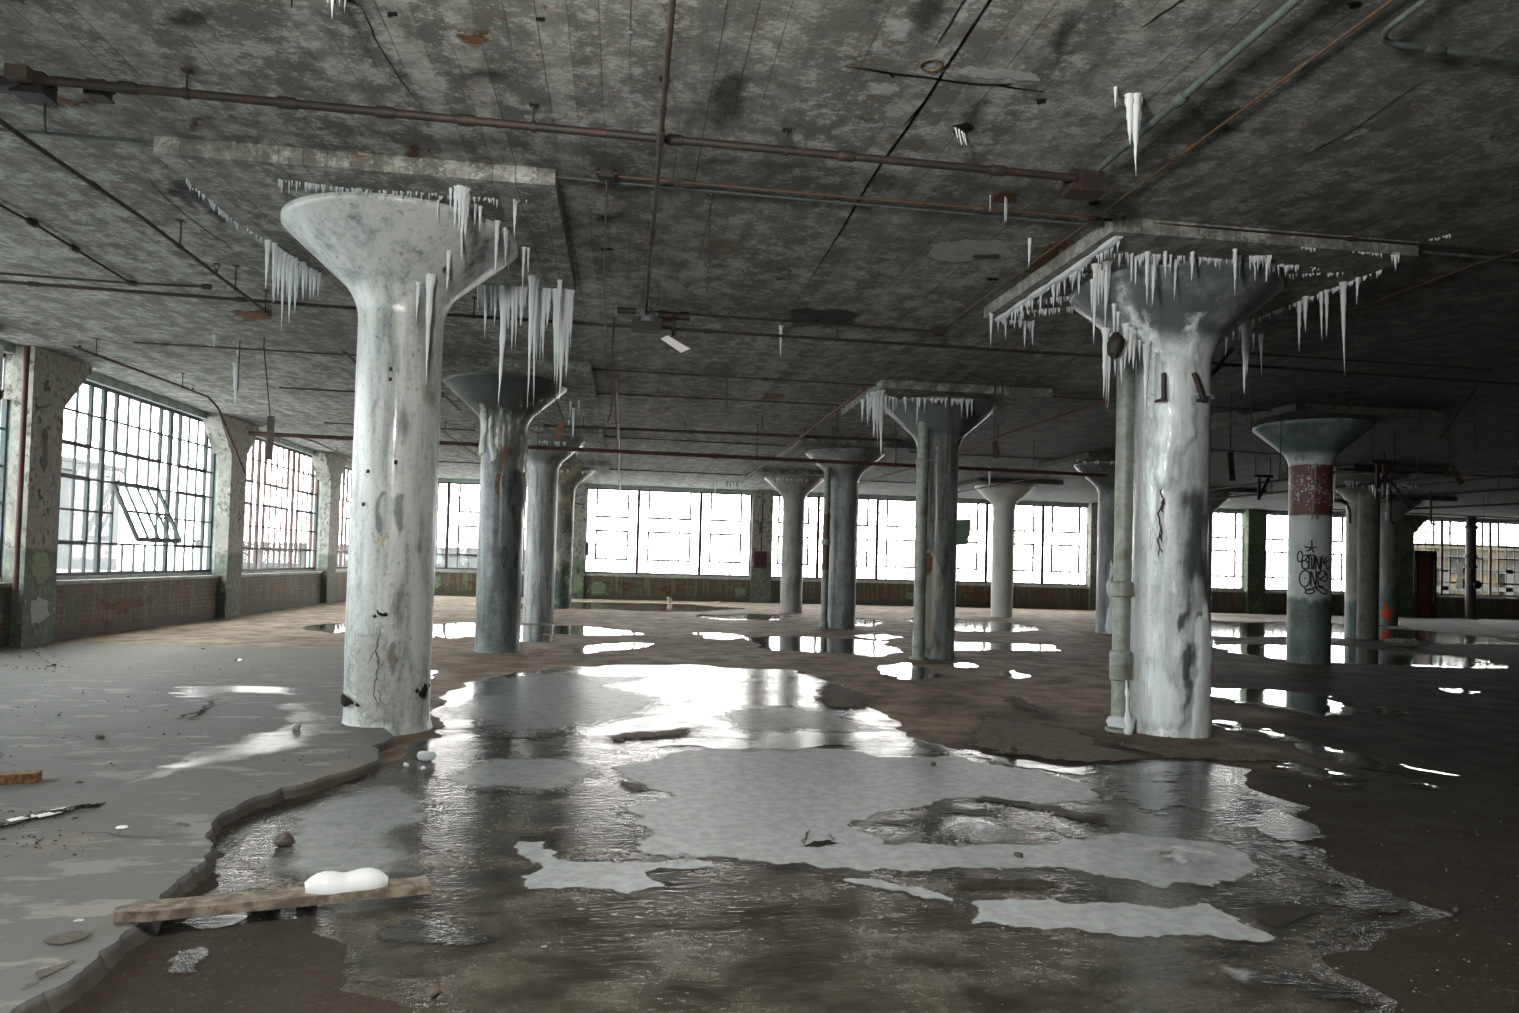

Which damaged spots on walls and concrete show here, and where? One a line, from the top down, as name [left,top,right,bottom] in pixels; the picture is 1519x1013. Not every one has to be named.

spalling [35,425,51,515]